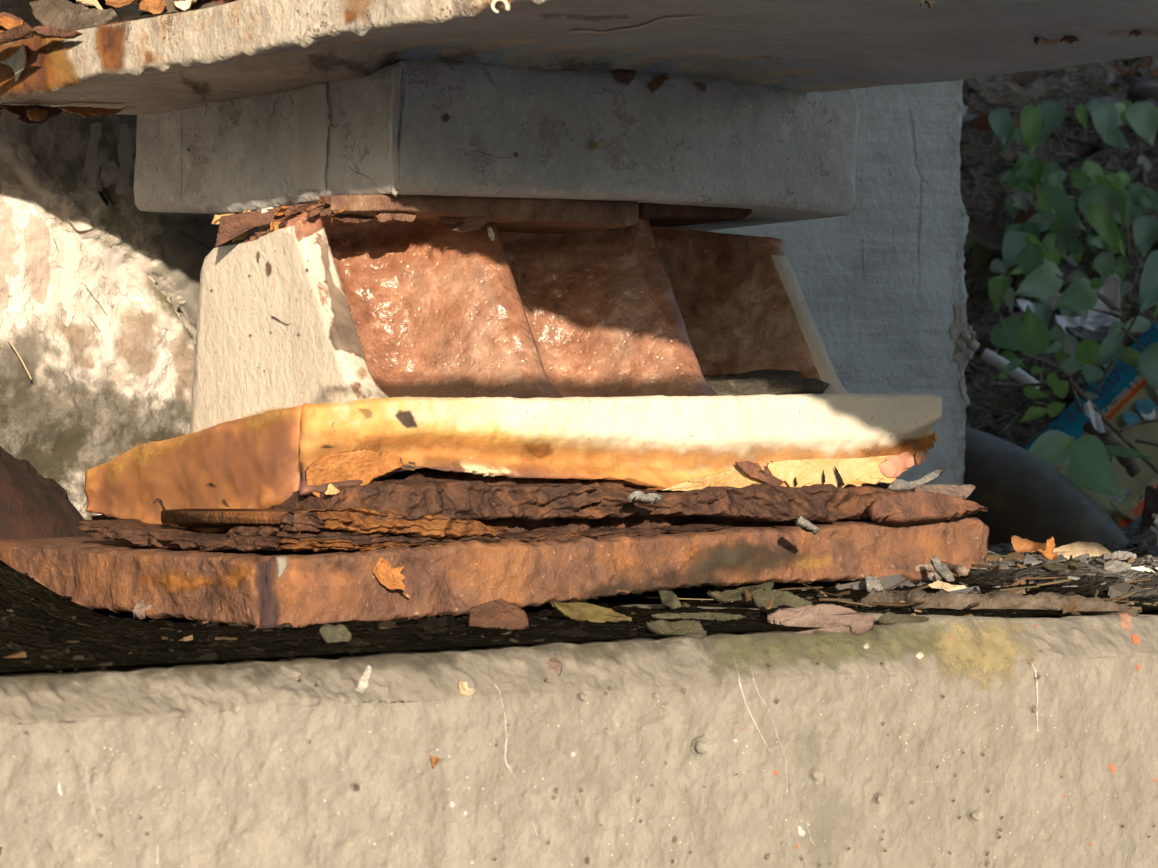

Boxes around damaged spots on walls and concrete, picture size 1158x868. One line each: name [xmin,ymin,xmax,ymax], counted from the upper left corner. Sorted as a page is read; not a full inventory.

peeling [0,44,27,82]
corrosion [0,12,124,124]
corrosion [345,0,369,23]
corrosion [316,237,367,377]
corrosion [246,409,287,428]
corrosion [78,433,988,639]